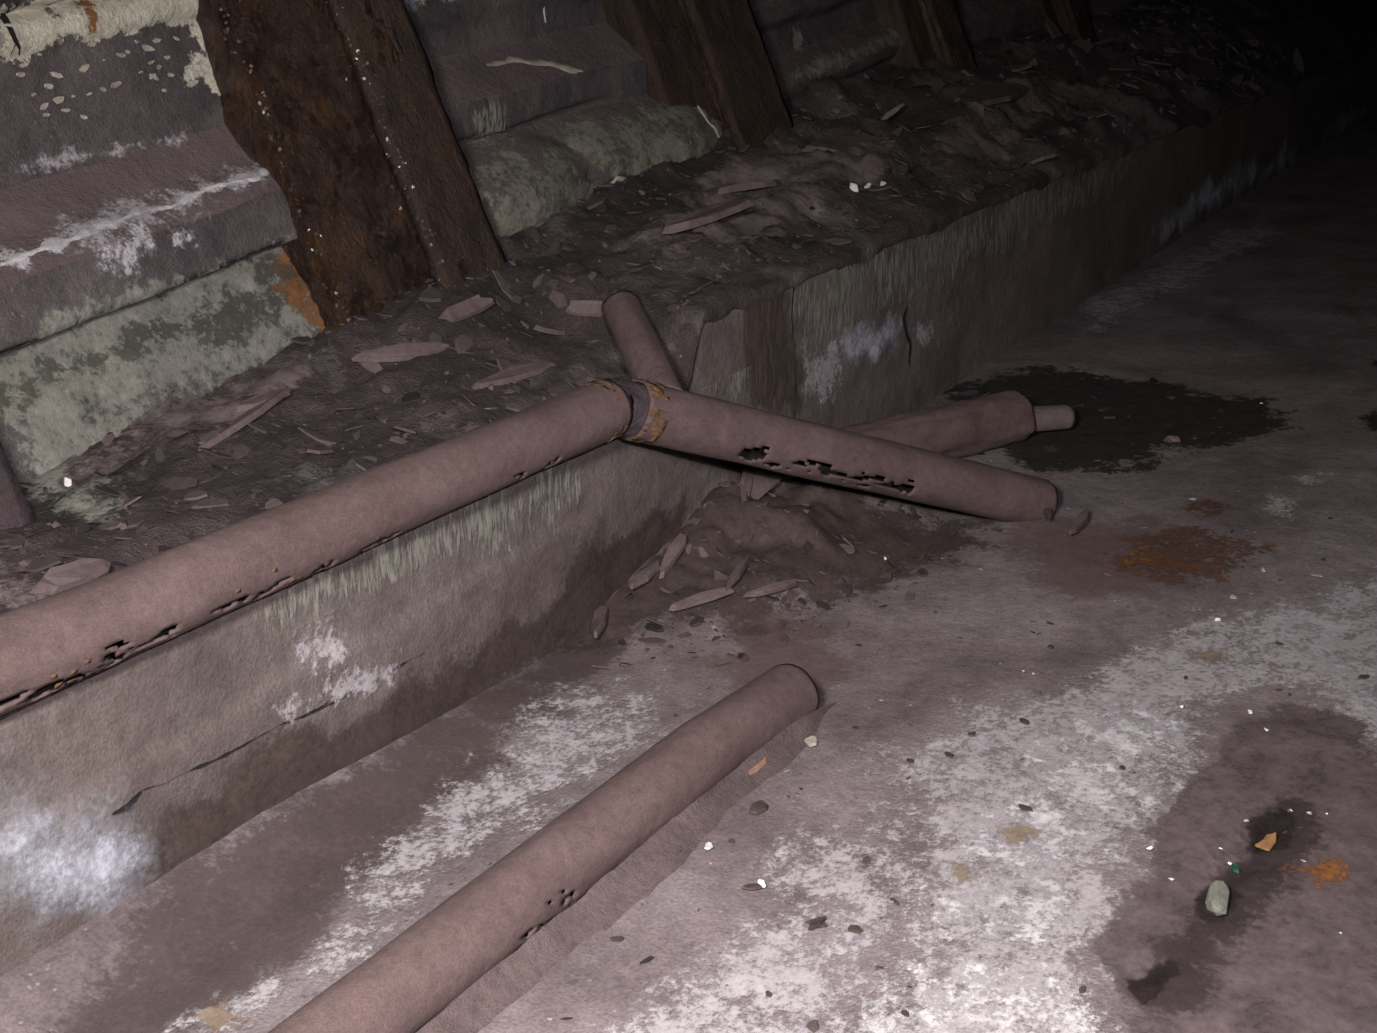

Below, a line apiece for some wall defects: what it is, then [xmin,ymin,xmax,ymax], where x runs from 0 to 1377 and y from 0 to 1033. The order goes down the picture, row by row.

leakage [0,163,320,524]
leakage [943,364,1303,475]
crack [112,653,424,815]
leakage [0,464,1001,1033]
leakage [605,566,1377,1033]